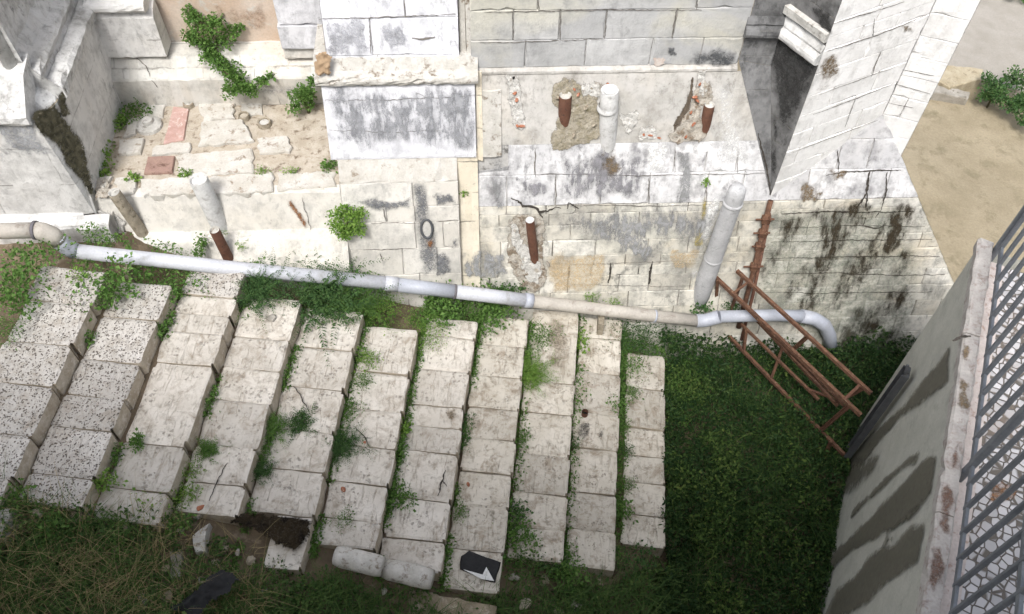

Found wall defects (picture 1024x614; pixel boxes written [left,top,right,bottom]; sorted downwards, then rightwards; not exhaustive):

damp [58,89,70,117]
damp [333,86,474,148]
spalling [505,74,526,130]
spalling [550,77,609,151]
spalling [619,69,713,145]
damp [365,186,456,275]
spalling [507,214,550,293]
crack [511,198,579,218]
damp [565,144,719,267]
damp [762,202,871,310]
crack [858,172,888,229]
damp [834,203,913,305]